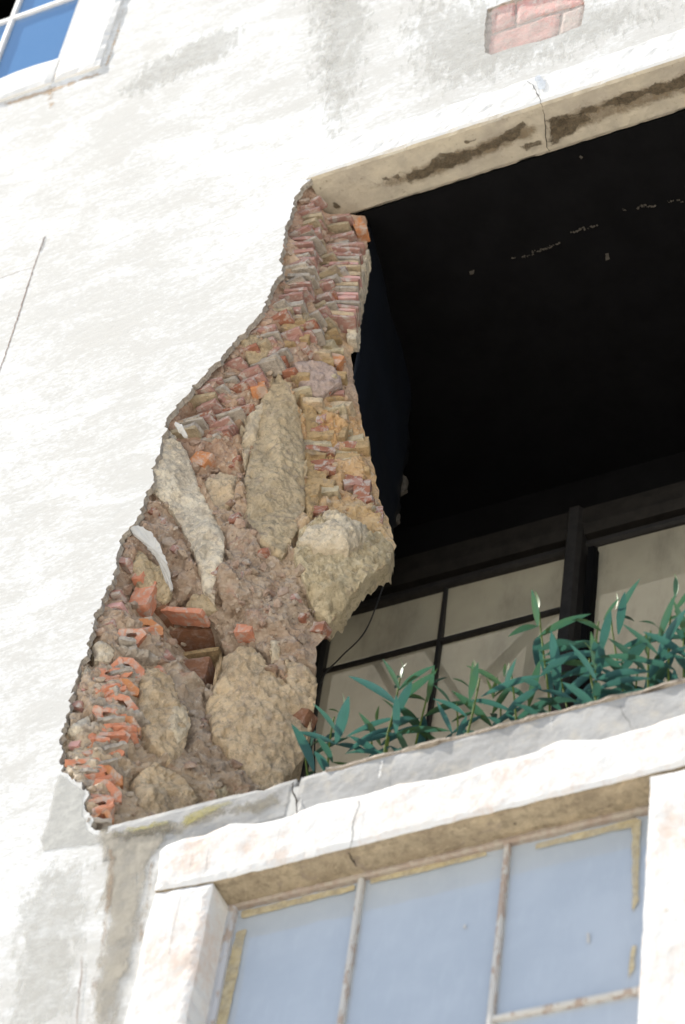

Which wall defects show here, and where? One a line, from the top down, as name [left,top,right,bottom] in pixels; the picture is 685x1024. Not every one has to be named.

flaking render [486,0,585,55]
damp [383,74,685,186]
crack [529,82,550,151]
spalling [62,187,400,831]
crack [349,806,359,867]